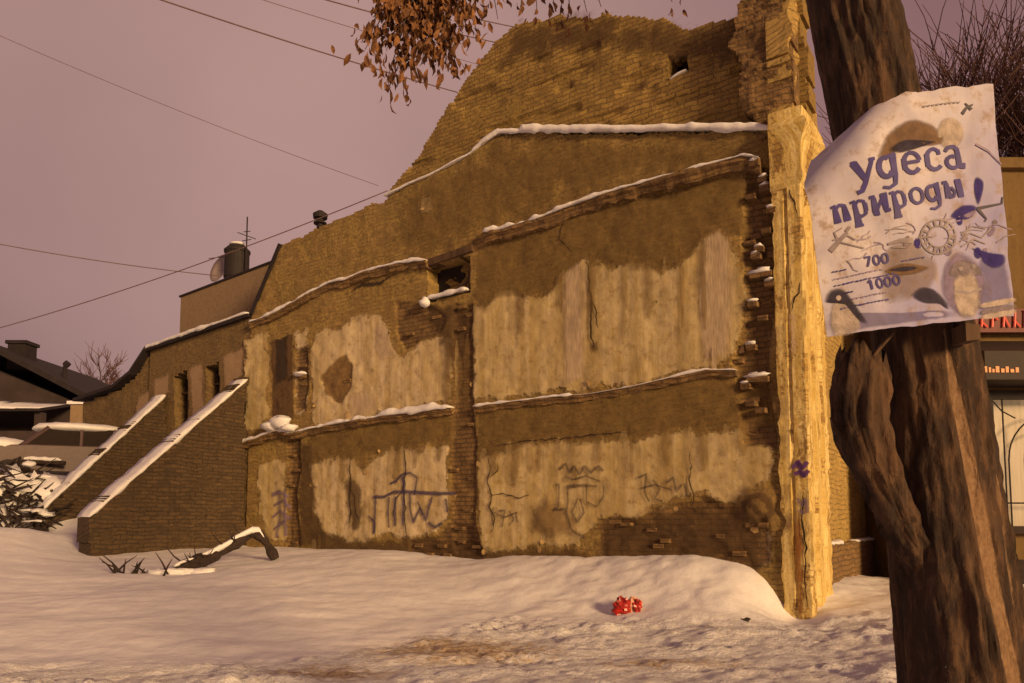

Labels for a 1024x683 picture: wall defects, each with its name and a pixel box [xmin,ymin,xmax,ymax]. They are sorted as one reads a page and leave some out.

crack [549,205,598,350]
peeling [256,169,778,570]
crack [348,458,360,522]
crack [486,432,634,532]
crack [798,495,808,605]